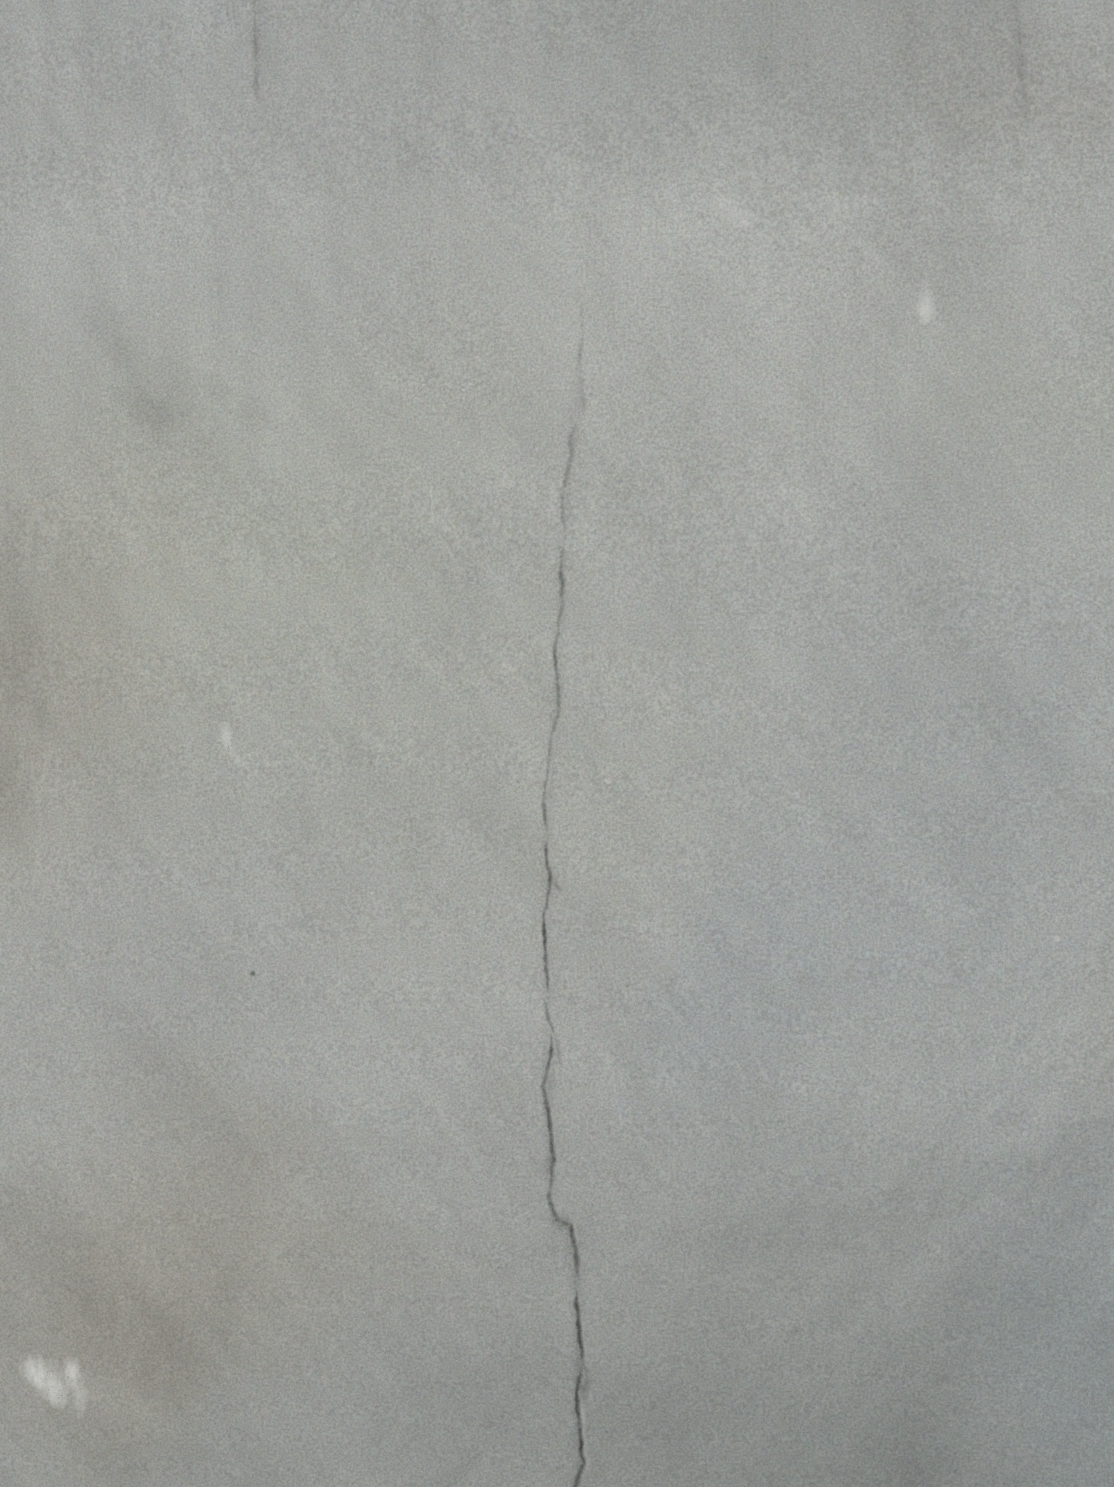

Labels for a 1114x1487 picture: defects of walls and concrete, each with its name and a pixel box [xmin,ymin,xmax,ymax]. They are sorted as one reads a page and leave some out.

crack [542,850,551,980]
crack [543,1045,556,1170]
crack [559,1218,585,1485]